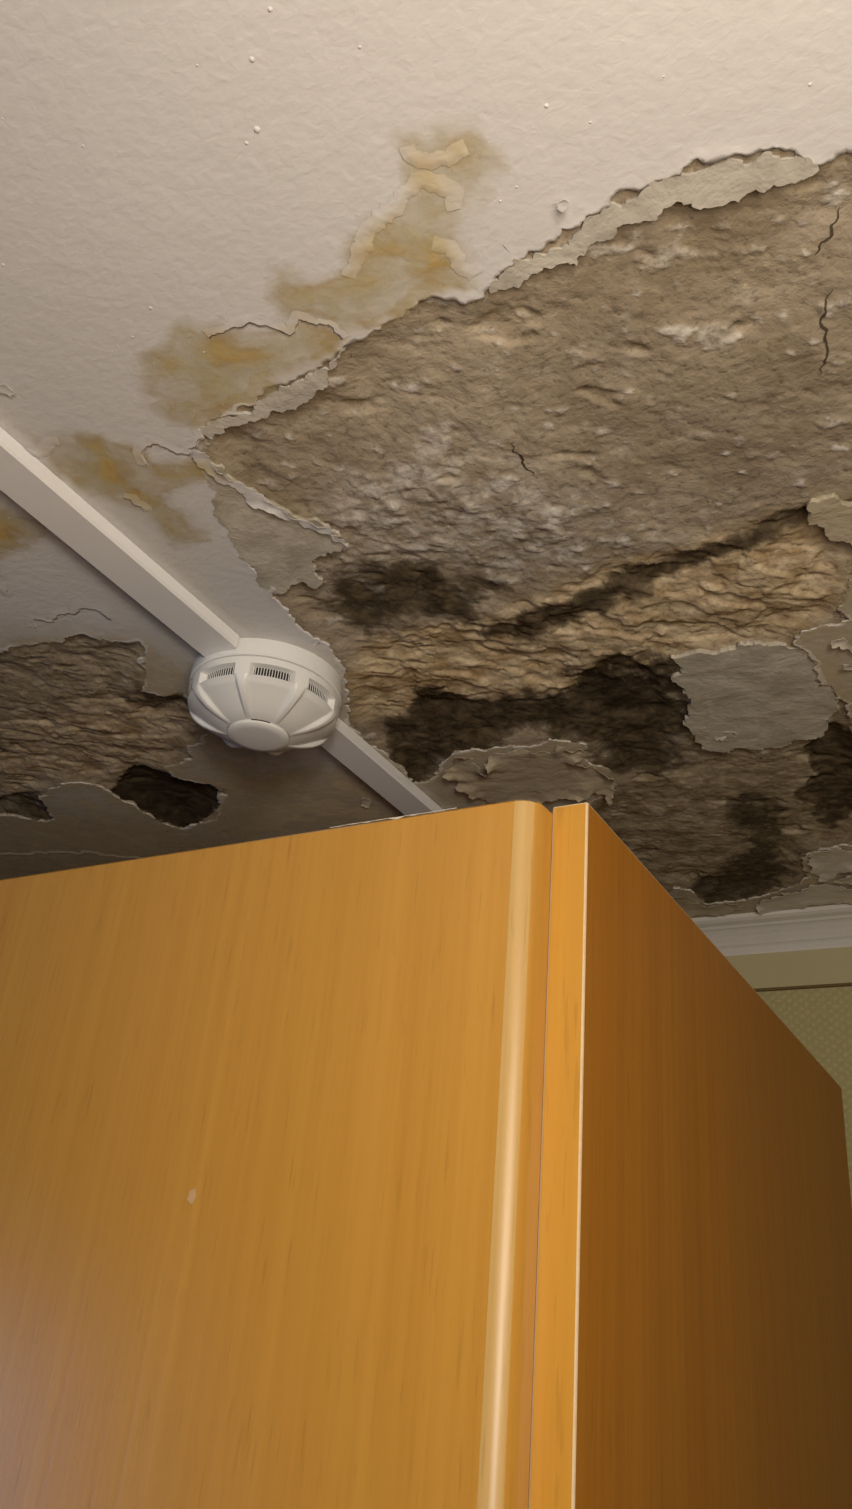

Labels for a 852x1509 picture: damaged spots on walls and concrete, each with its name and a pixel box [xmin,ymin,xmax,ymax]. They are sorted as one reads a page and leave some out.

water stain [281,208,452,349]
water stain [155,335,282,413]
water stain [73,436,191,537]
spalling [180,126,852,917]
water stain [796,577,852,712]
spalling [0,627,239,834]
water stain [428,741,613,808]
water stain [542,793,604,812]
water stain [678,845,852,918]